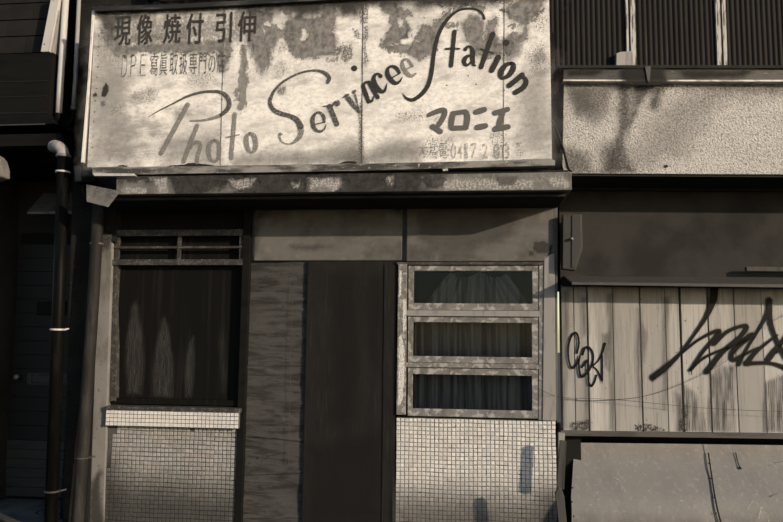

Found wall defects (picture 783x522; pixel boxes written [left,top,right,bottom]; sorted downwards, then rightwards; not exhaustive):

leakage [572,85,608,119]
leakage [603,84,669,172]